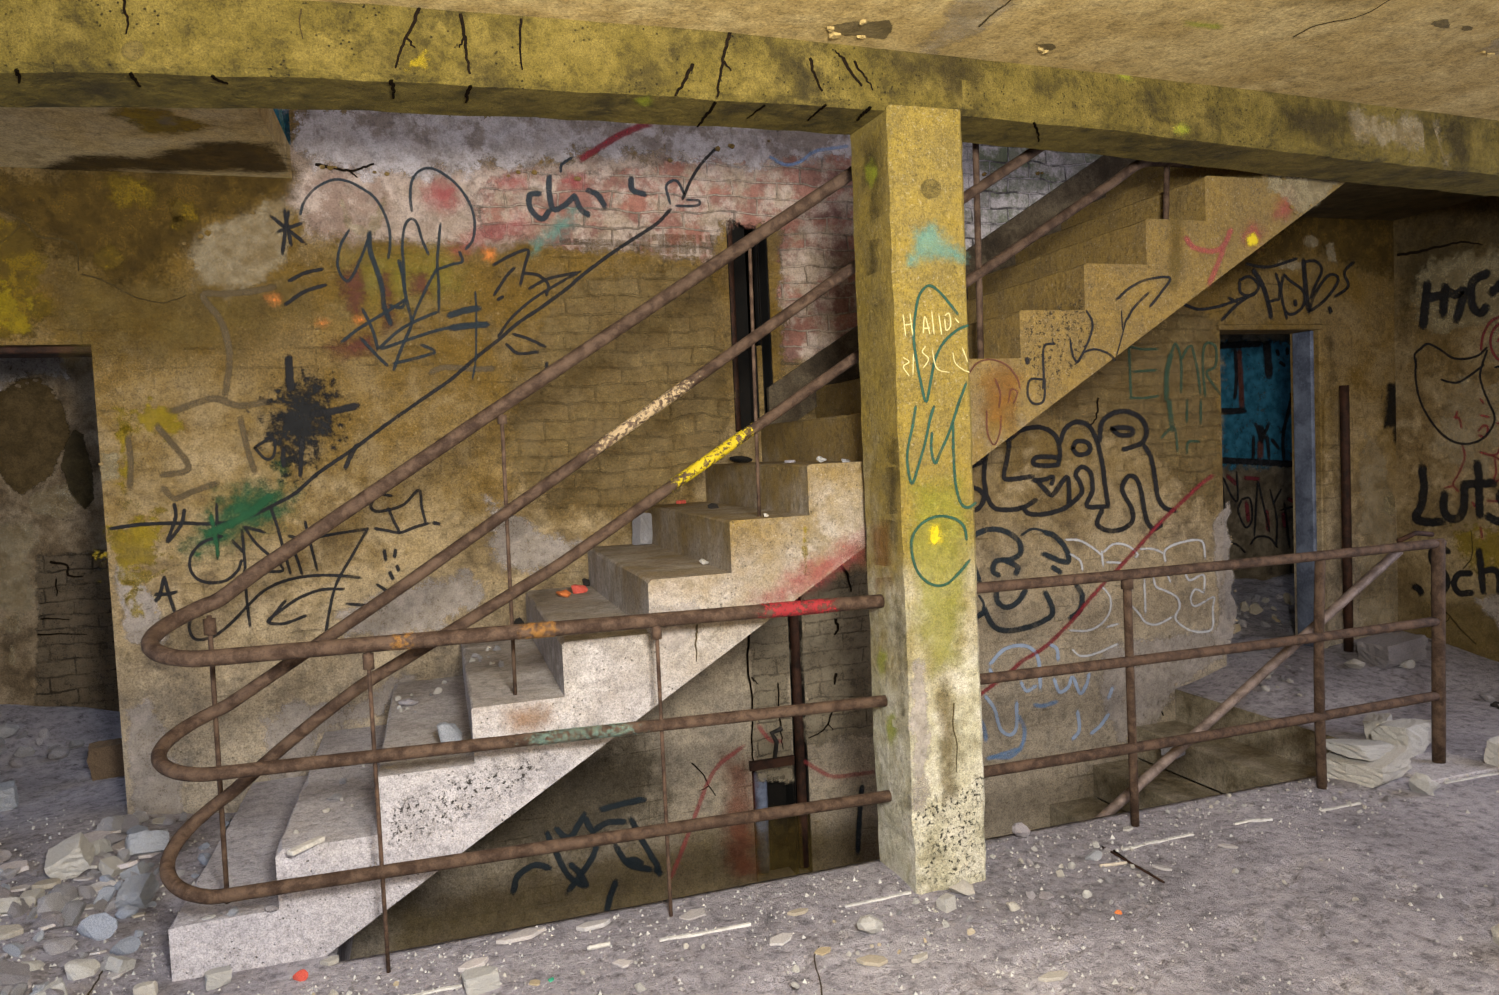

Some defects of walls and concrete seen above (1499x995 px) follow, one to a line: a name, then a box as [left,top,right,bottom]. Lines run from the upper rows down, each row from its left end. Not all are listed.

crack [122,0,130,34]
crack [129,72,141,88]
crack [389,7,421,99]
crack [459,13,472,103]
crack [674,32,766,128]
crack [807,50,873,121]
leakage [0,107,297,288]
spalling [284,110,858,517]
spalling [0,377,184,815]